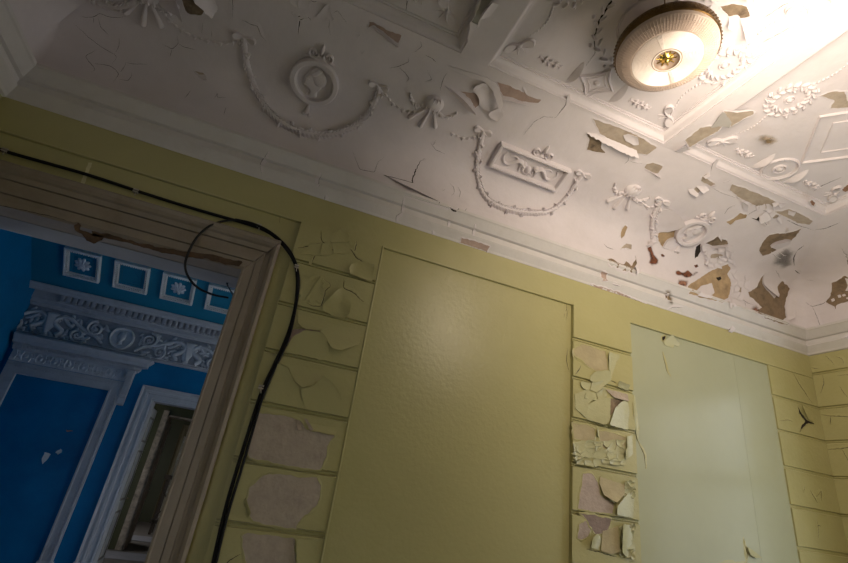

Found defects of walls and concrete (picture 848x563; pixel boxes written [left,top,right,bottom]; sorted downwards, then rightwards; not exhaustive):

crack [586,0,624,66]
peeling [445,66,543,121]
peeling [586,117,664,179]
peeling [674,110,756,153]
peeling [819,90,848,110]
peeling [725,183,814,256]
peeling [590,224,647,304]
peeling [687,235,738,304]
peeling [747,273,796,326]
peeling [825,275,848,313]
peeling [240,314,361,563]
peeling [571,343,640,560]